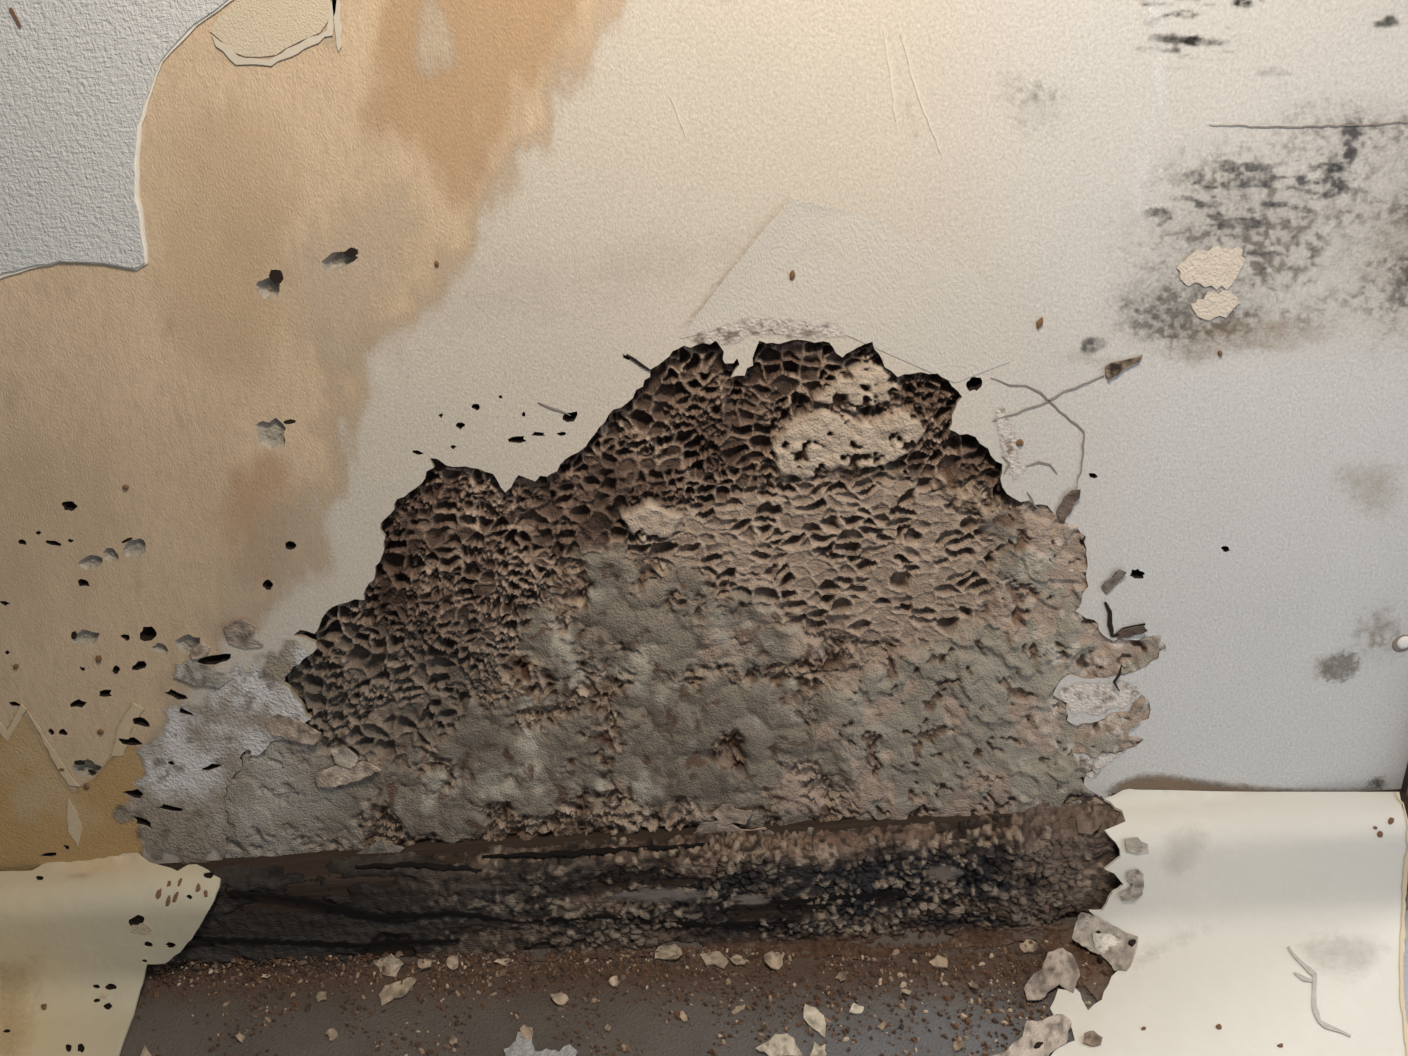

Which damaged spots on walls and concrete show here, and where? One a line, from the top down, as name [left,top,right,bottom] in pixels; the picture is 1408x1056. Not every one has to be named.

damp [1297,124,1375,219]
damp [1134,163,1322,340]
damp [0,0,624,792]
crack [626,354,651,372]
crack [991,355,1143,512]
damp [224,542,901,858]
spalling [828,489,1166,820]
peeling [264,714,381,788]
crack [355,843,710,872]
peeling [694,804,767,834]
crack [191,890,961,948]
flaking render [756,1004,827,1056]